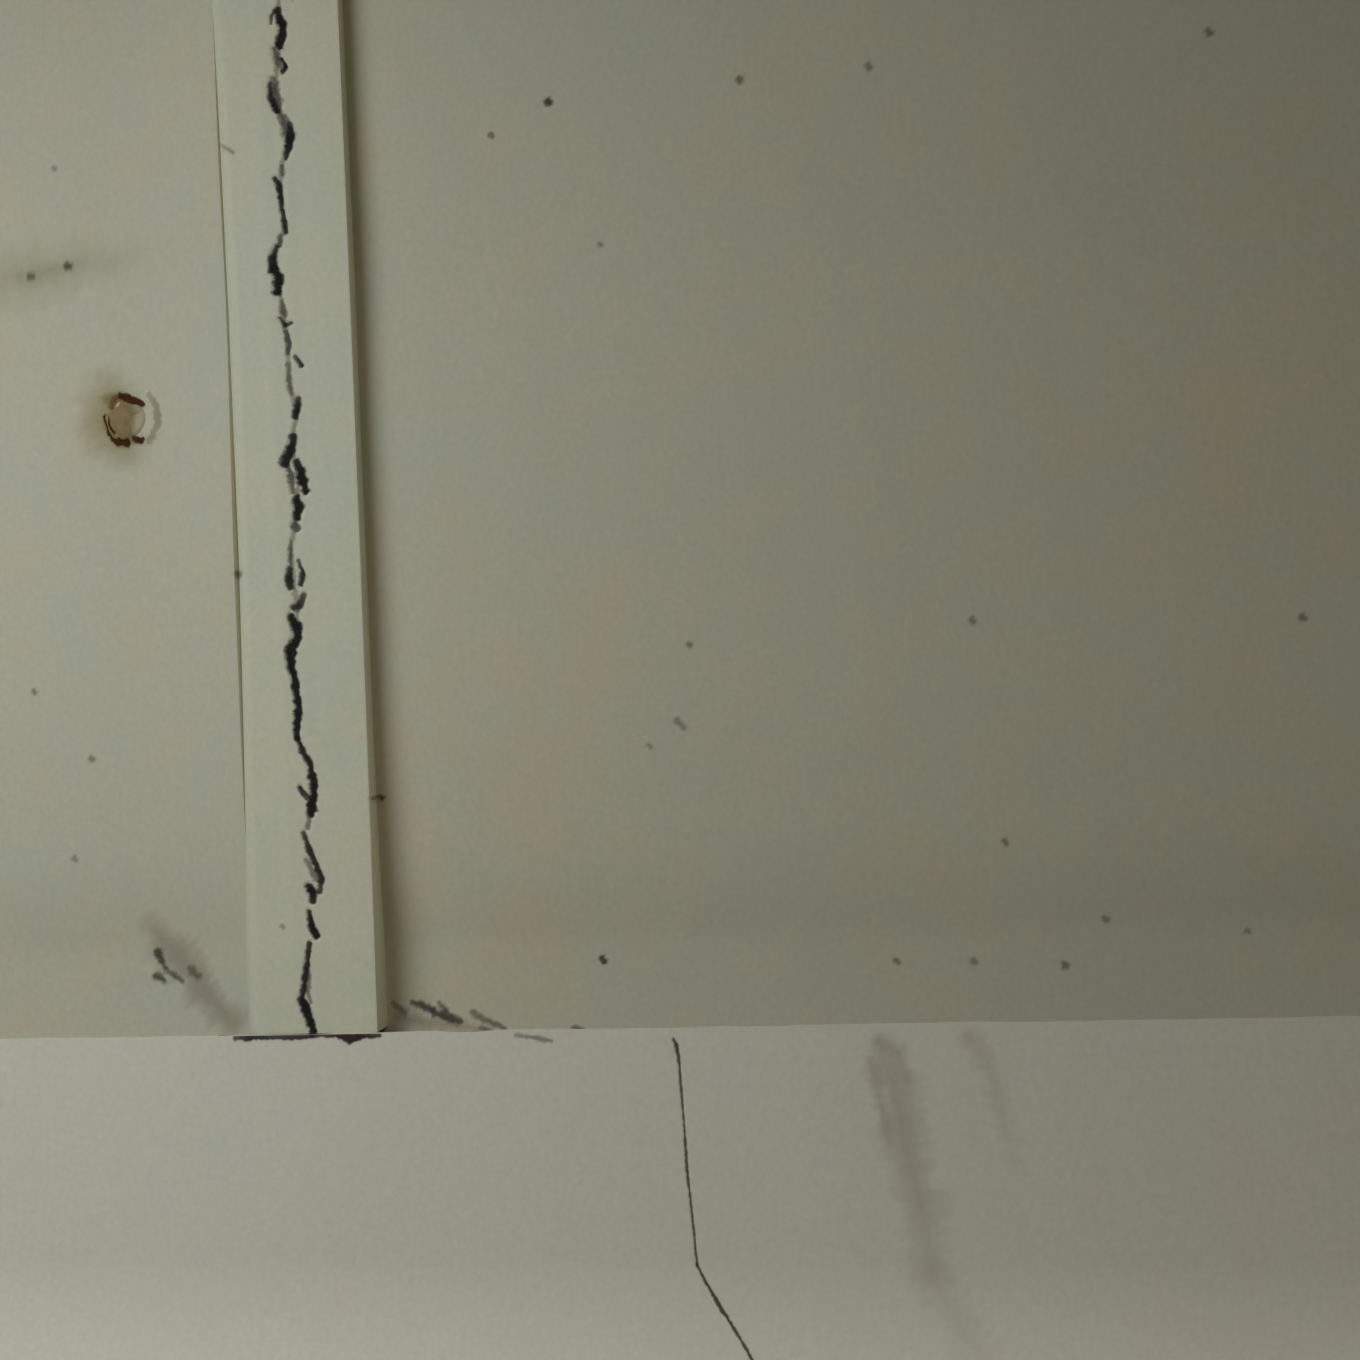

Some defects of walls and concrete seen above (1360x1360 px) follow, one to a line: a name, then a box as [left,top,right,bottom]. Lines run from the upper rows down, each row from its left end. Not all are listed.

corrosion [99,393,145,447]
crack [233,7,381,1044]
crack [672,1038,754,1360]